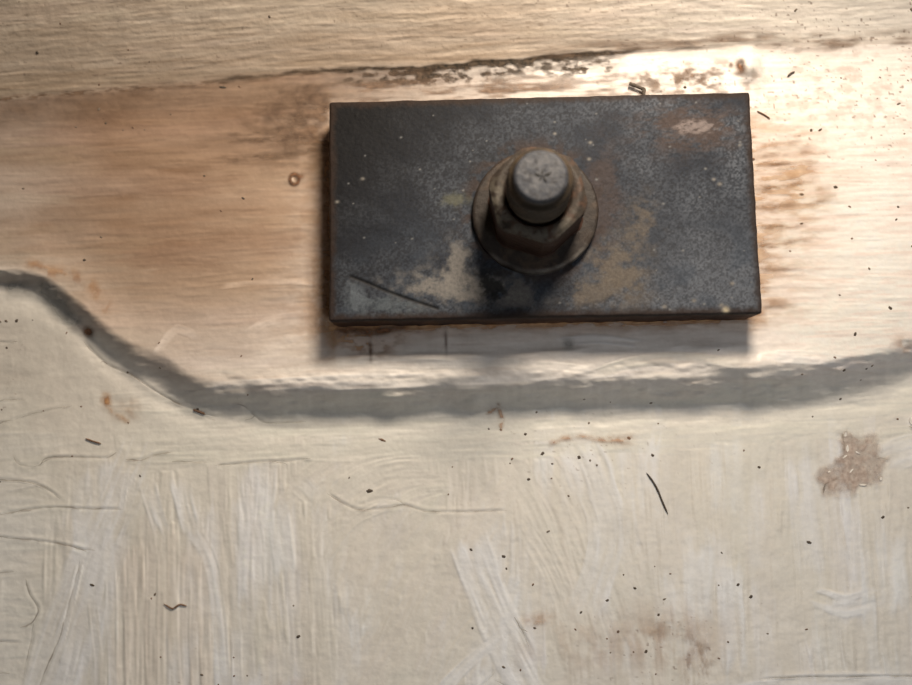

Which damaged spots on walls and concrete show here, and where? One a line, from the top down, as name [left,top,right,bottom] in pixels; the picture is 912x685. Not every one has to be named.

corrosion [318,160,722,351]
water stain [40,284,74,323]
peeling [818,431,884,493]